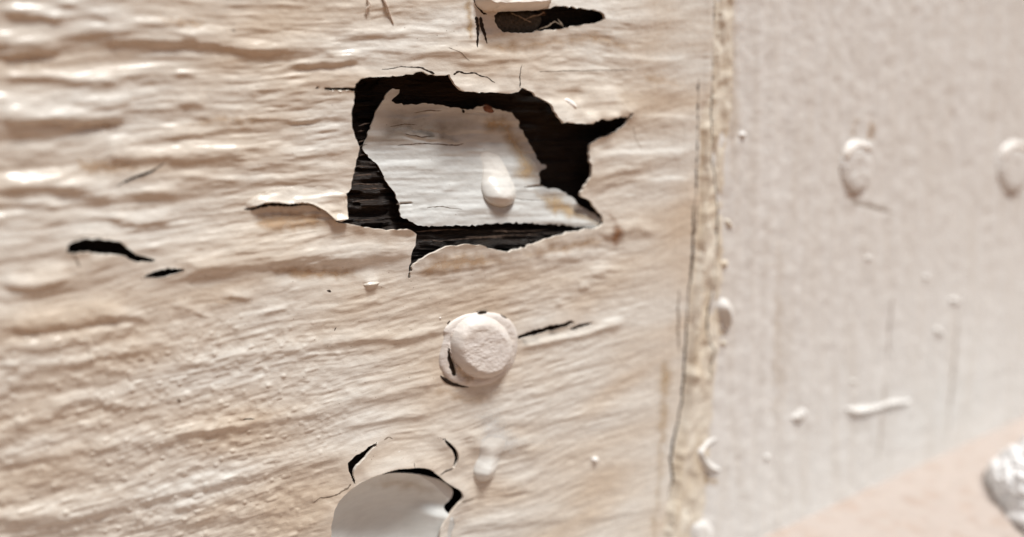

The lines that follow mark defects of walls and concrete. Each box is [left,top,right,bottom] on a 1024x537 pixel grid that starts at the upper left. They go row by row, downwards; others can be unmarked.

spalling [530,6,602,31]
peeling [245,66,642,278]
spalling [143,268,183,278]
crack [518,321,589,339]